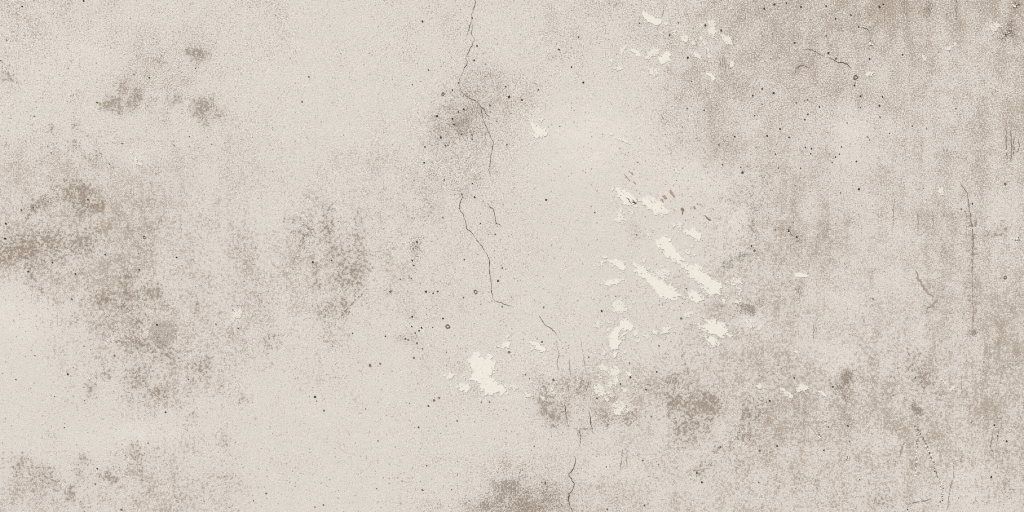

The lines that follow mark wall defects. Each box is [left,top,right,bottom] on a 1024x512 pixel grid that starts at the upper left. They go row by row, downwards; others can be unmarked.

peeling [642,11,733,60]
crack [459,200,511,306]
peeling [593,186,744,415]
peeling [442,335,565,401]